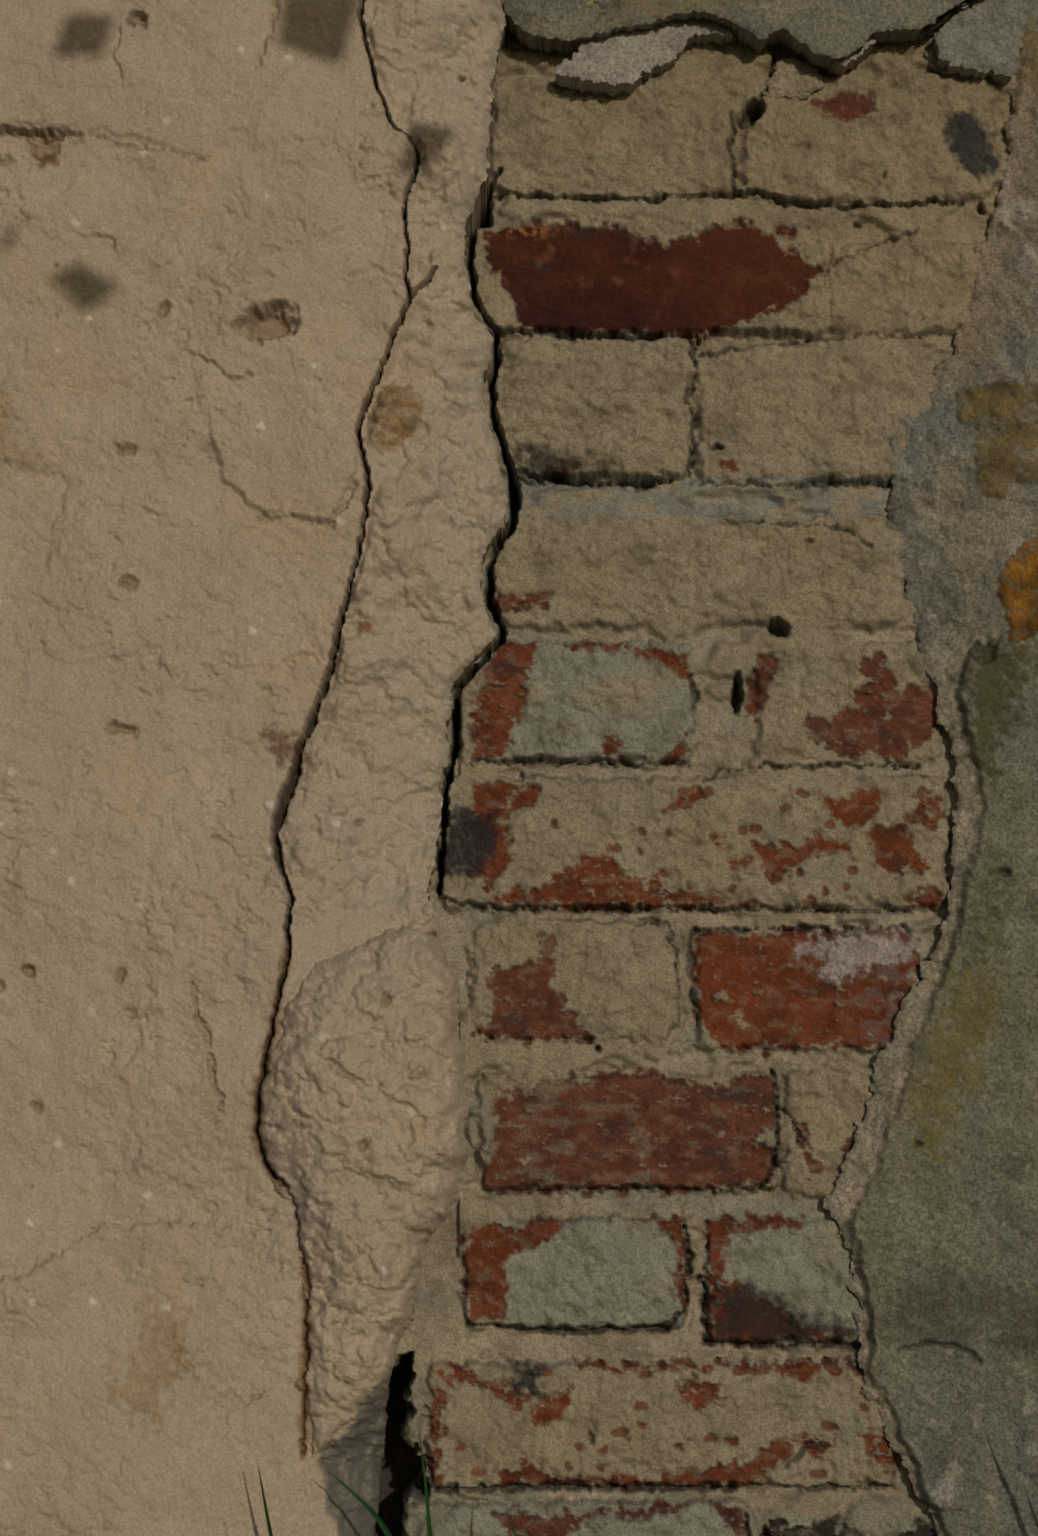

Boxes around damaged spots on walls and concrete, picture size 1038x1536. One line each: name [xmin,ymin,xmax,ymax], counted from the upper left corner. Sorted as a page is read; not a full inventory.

crack [97,135,212,162]
leakage [998,537,1038,641]
crack [186,0,967,1462]
spalling [375,0,1031,1536]
crack [0,1217,263,1284]
crack [896,1340,985,1365]